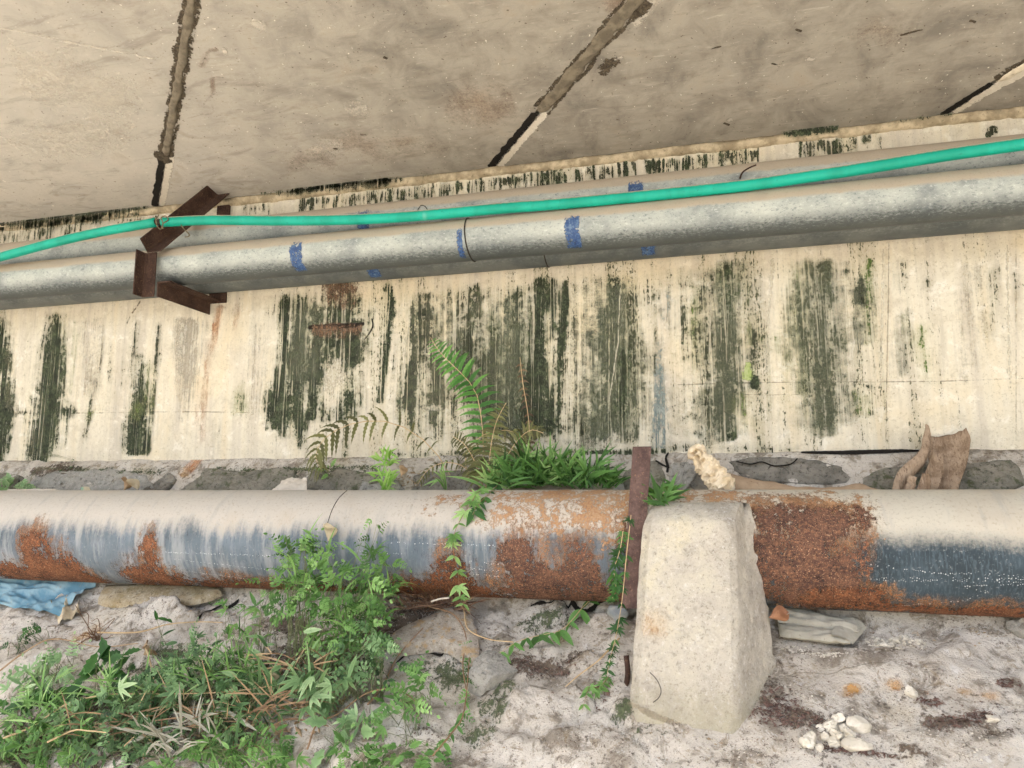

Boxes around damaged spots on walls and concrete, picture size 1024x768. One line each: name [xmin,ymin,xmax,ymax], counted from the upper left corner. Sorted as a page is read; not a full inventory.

leakage [784,125,842,158]
leakage [243,147,759,215]
leakage [0,206,157,243]
rust [322,283,358,310]
leakage [261,253,933,456]
leakage [0,310,162,477]